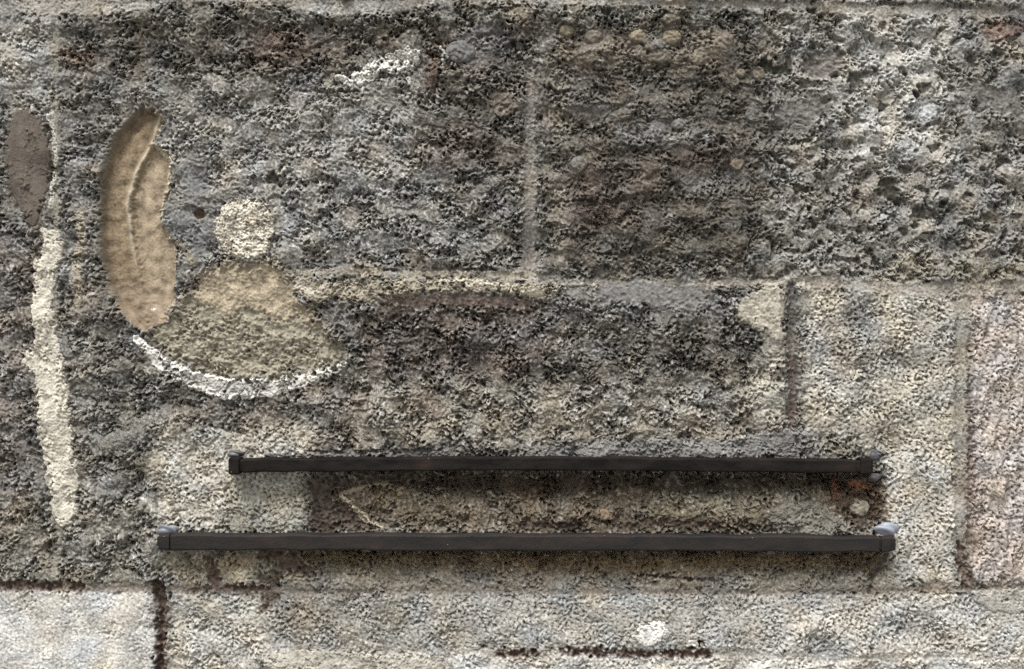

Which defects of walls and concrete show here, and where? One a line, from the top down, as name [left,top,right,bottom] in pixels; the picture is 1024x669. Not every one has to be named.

spalling [92,105,349,387]
leakage [133,335,347,400]
corrosion [330,473,880,526]